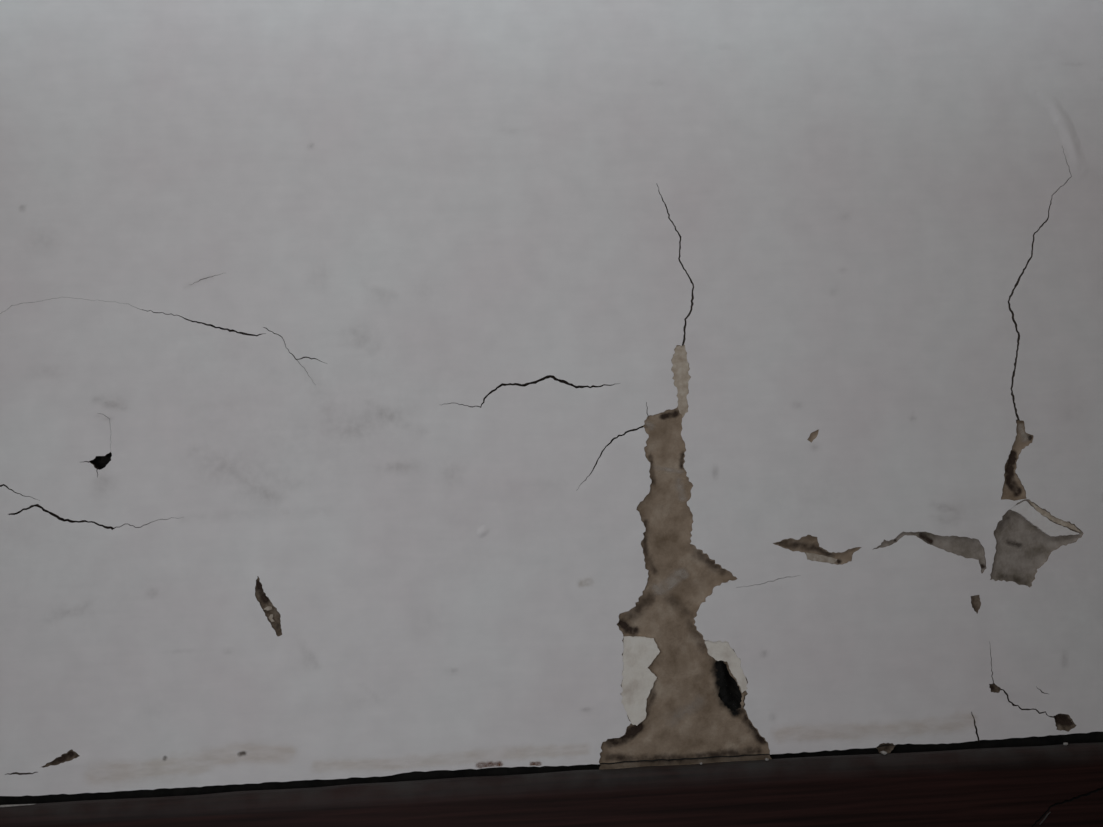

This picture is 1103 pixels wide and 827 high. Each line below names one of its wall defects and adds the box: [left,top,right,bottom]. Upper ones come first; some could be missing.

crack [657,185,694,346]
crack [1008,147,1072,421]
crack [0,297,327,383]
crack [442,375,619,408]
spalling [84,413,112,477]
crack [576,402,649,491]
crack [0,484,183,530]
flaking render [773,420,1083,587]
flaking render [599,345,772,769]
flaking render [255,576,282,636]
crack [989,642,1055,718]
flaking render [42,750,80,768]